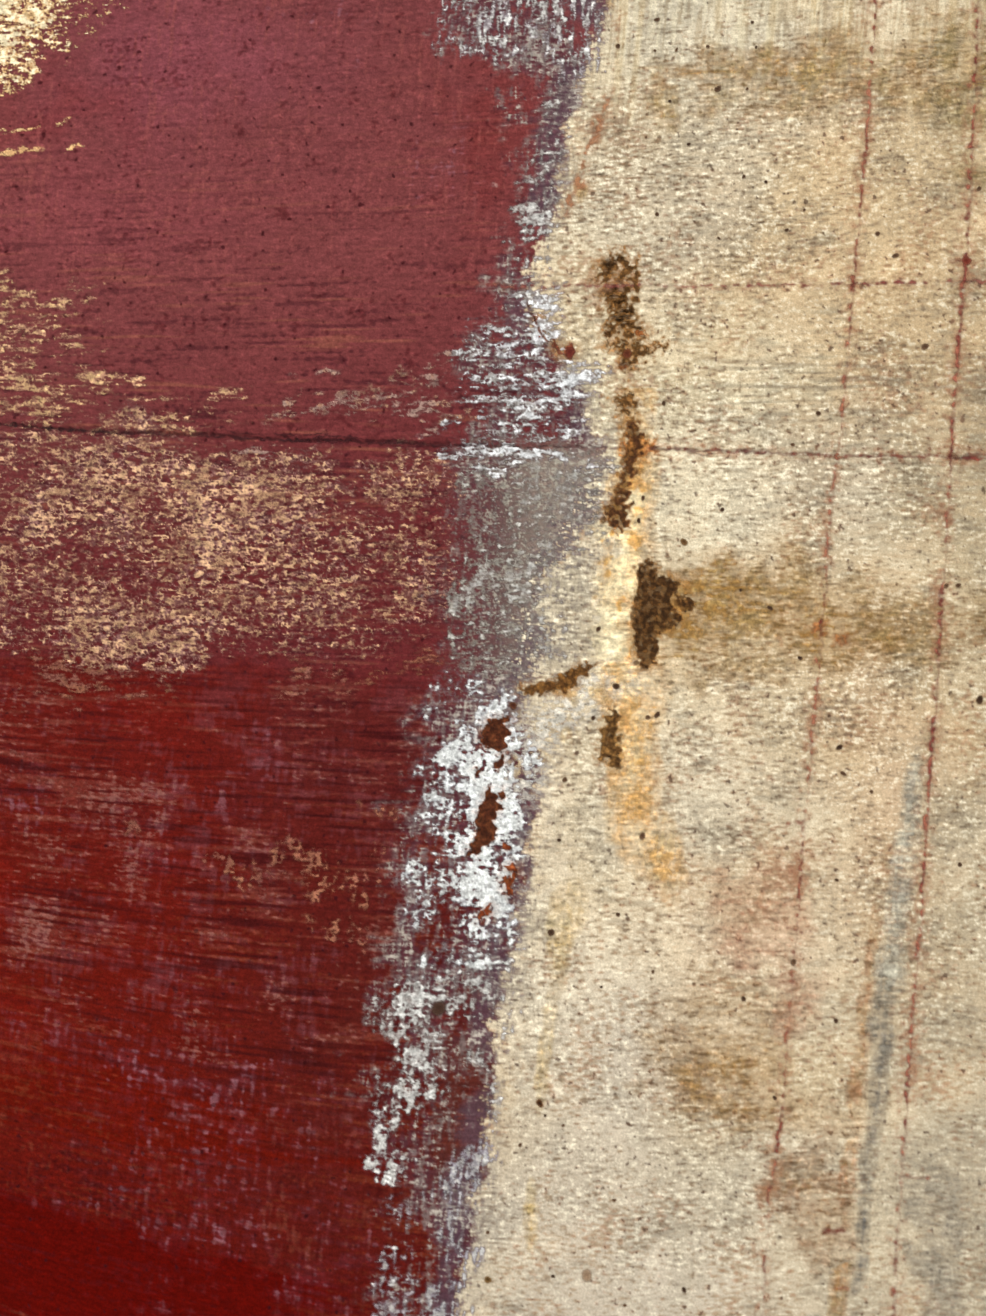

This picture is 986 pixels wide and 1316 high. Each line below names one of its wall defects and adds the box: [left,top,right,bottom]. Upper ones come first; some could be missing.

peeling [0,0,125,96]
peeling [438,0,620,115]
corrosion [591,246,669,421]
crack [12,423,487,447]
corrosion [619,439,658,480]
water stain [661,558,938,664]
peeling [0,126,648,1226]